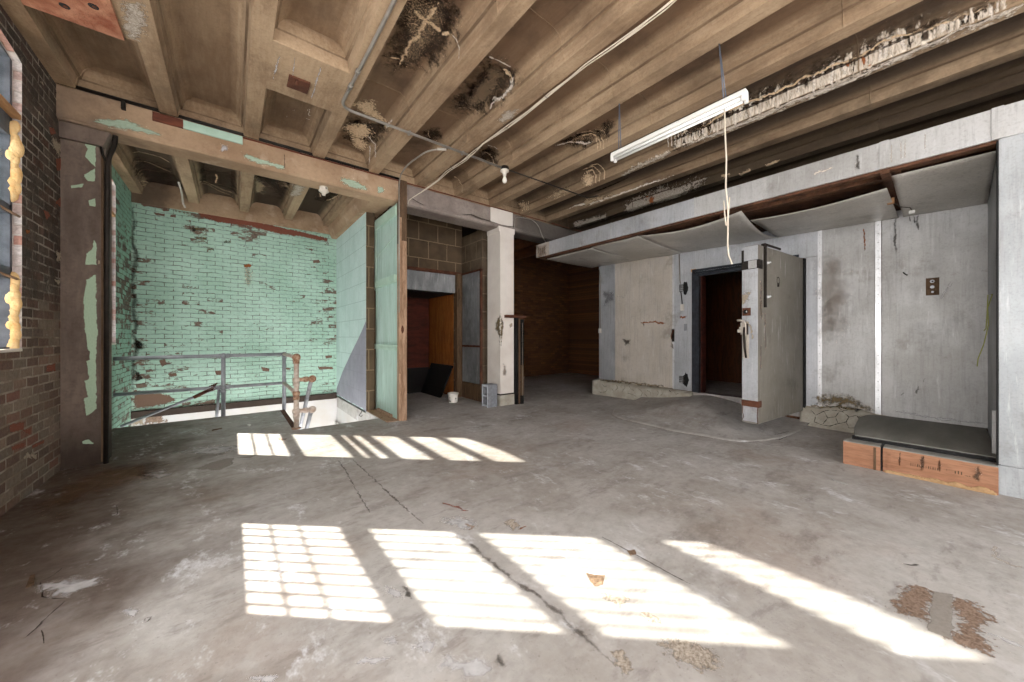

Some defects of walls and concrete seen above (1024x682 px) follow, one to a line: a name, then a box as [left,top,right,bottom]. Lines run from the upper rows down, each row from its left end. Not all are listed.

damp [383,0,460,69]
damp [454,56,516,116]
damp [569,0,1023,209]
damp [341,99,392,162]
damp [559,121,613,150]
peeling [71,168,95,188]
peeling [198,213,328,242]
peeling [85,241,100,265]
peeling [131,390,175,426]
spalling [890,585,934,623]
spalling [944,597,999,658]